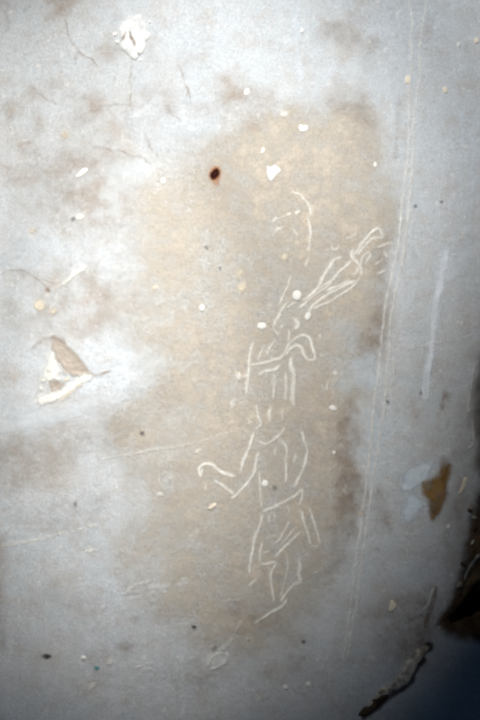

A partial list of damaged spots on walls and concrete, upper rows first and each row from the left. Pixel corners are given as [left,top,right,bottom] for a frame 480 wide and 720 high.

spalling [112,14,151,61]
spalling [38,338,92,404]
spalling [358,642,433,719]